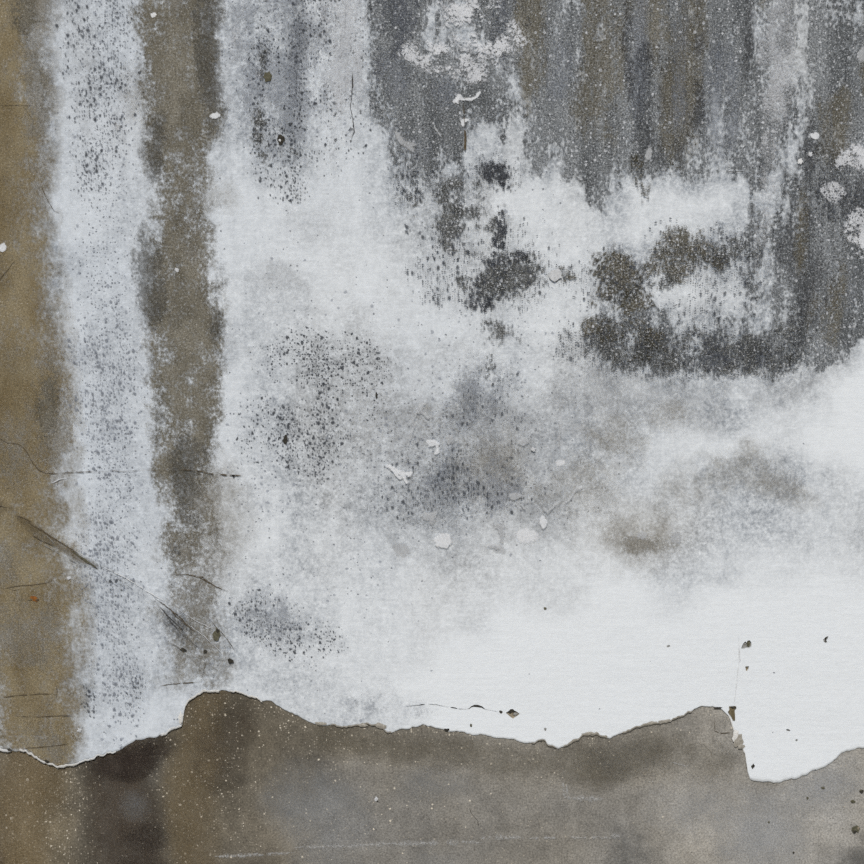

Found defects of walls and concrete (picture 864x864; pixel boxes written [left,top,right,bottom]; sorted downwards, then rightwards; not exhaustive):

leakage [246,0,864,387]
leakage [0,0,226,864]
leakage [236,326,396,485]
leakage [367,440,546,526]
leakage [446,354,522,430]
peeling [0,689,864,864]